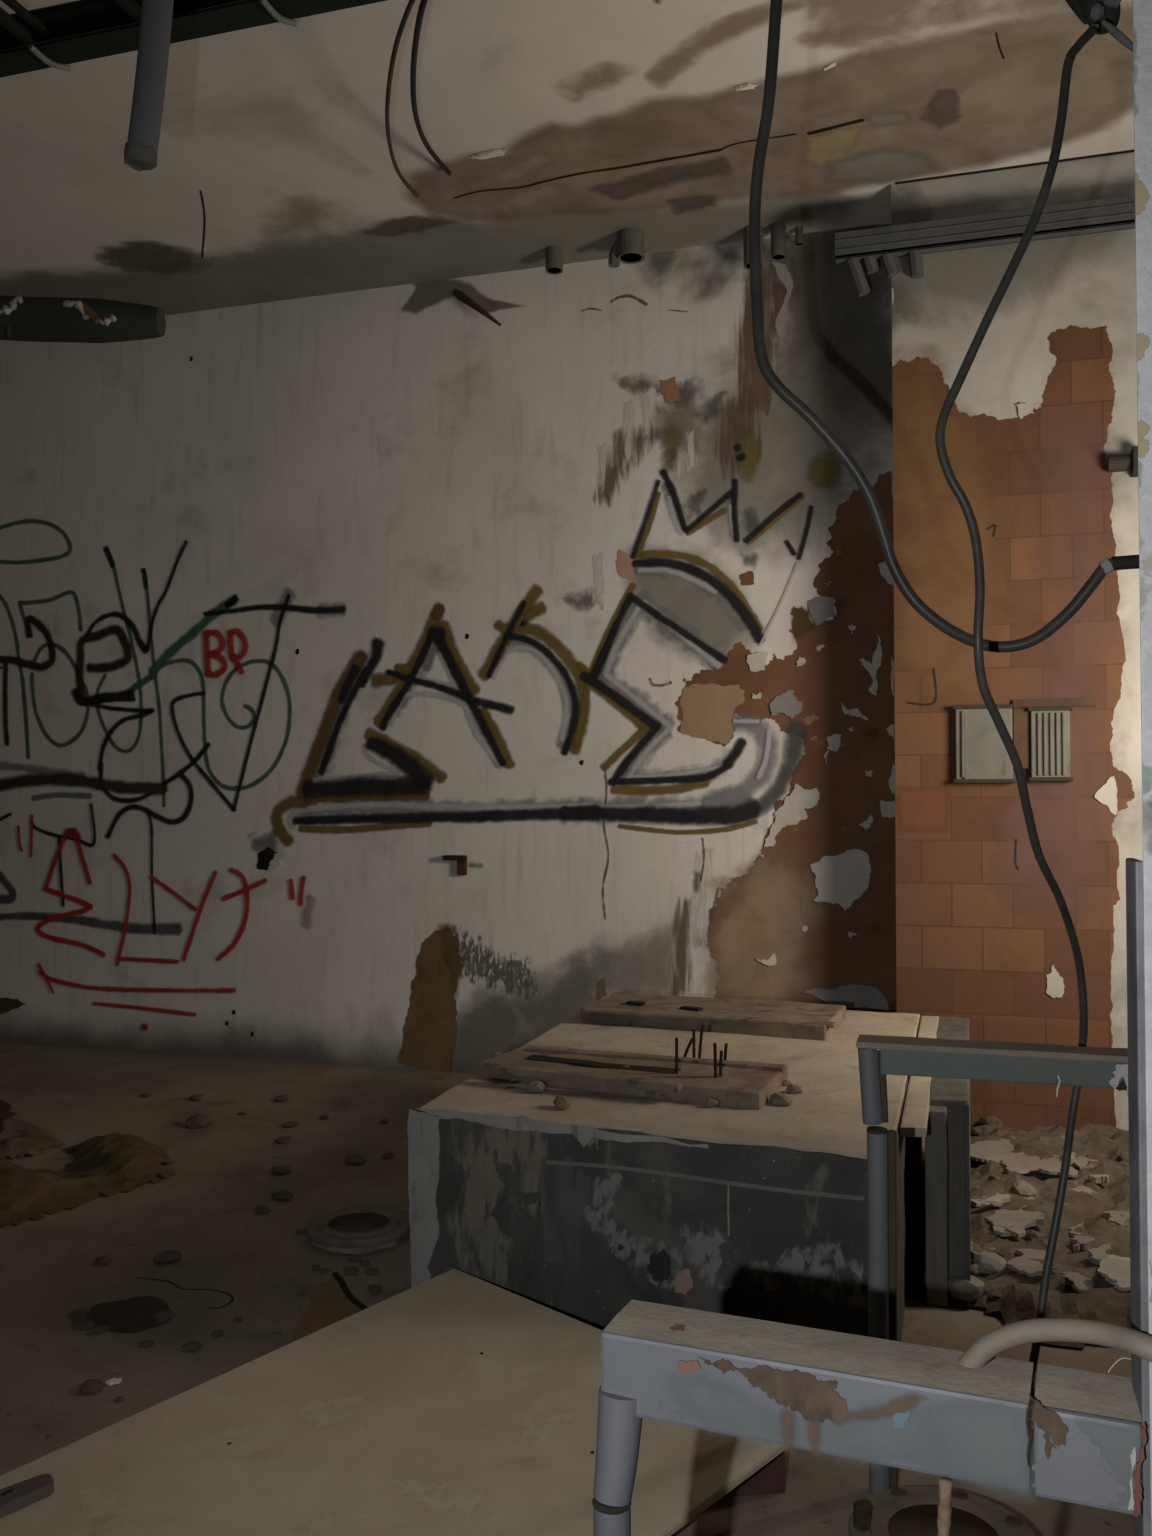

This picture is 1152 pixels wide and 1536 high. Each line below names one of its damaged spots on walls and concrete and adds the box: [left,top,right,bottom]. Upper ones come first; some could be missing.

crack [995,33,1005,59]
crack [454,119,864,199]
leakage [0,0,1134,563]
peeling [598,397,651,486]
leakage [568,595,594,608]
leakage [633,557,747,656]
flaking render [675,325,1152,1131]
flaking render [398,925,462,1072]
peeling [407,1108,709,1288]
spalling [646,1249,694,1295]
peeling [678,1381,1139,1510]